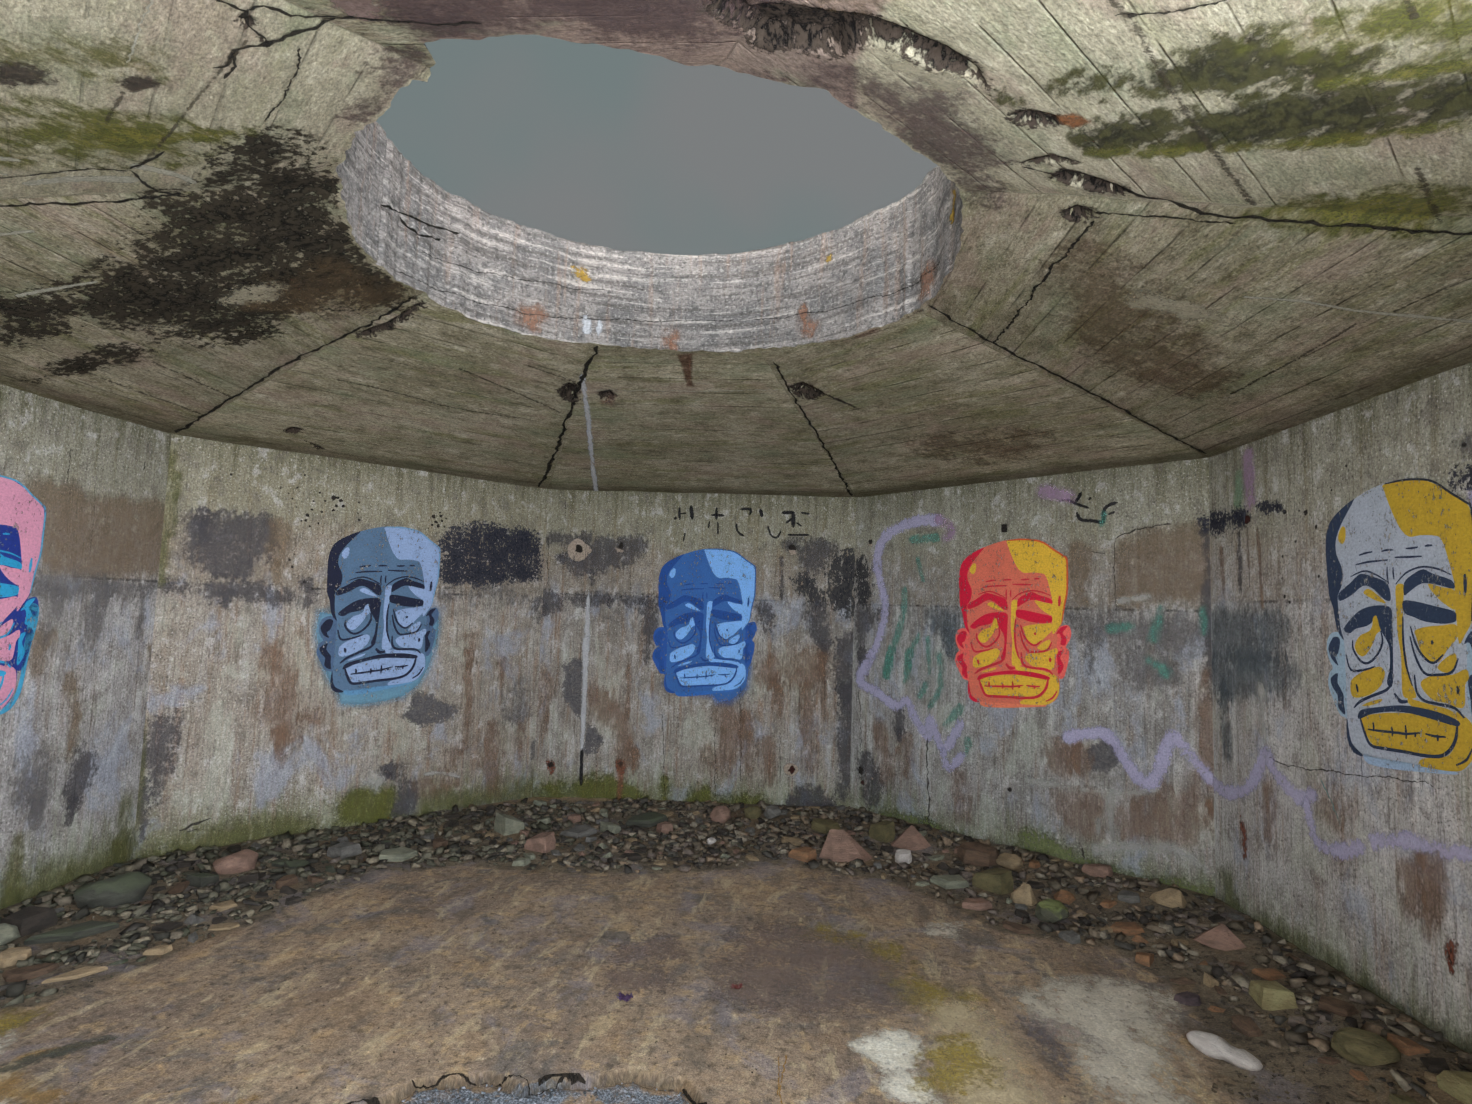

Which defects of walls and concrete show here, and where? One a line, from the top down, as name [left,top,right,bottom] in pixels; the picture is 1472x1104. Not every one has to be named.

crack [1115,0,1226,18]
crack [214,0,481,121]
spalling [706,0,996,94]
damp [990,90,1025,106]
spalling [1004,108,1090,130]
damp [1045,25,1472,156]
crack [0,151,189,207]
spalling [1010,154,1130,224]
damp [0,125,417,384]
crack [174,185,1472,584]
crack [346,1096,380,1104]
crack [412,1073,586,1096]